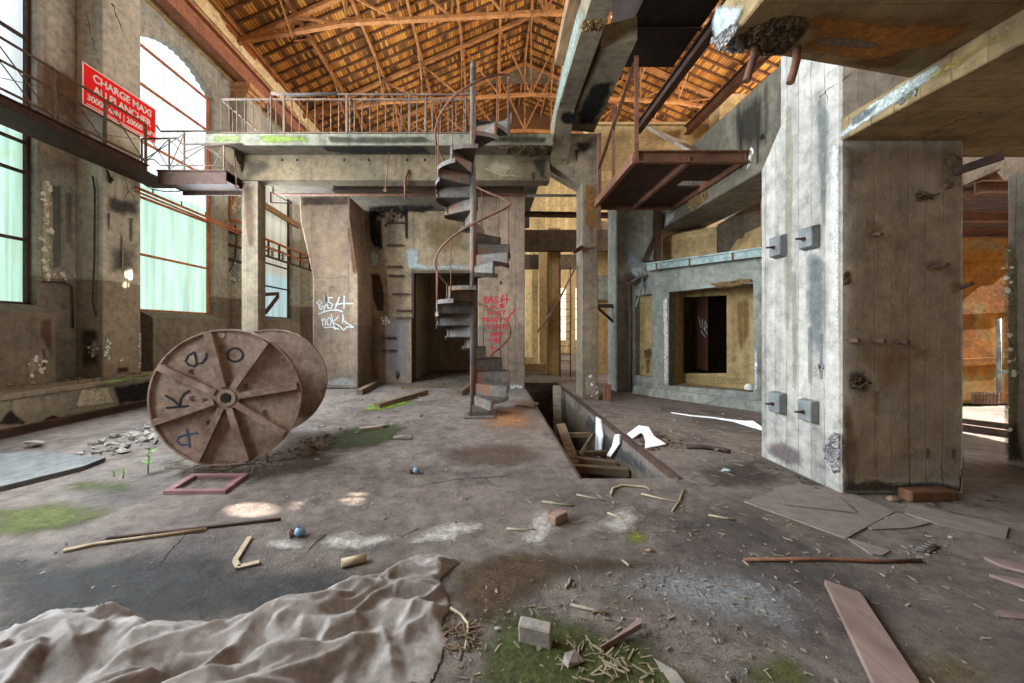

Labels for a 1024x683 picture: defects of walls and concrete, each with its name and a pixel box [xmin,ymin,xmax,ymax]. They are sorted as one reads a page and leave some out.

spalling [710,15,810,59]
rust [801,15,968,68]
flaking render [851,105,877,127]
flaking render [892,86,919,105]
flaking render [38,179,76,281]
leakage [369,205,468,311]
leakage [809,258,823,378]
spalling [822,432,846,474]